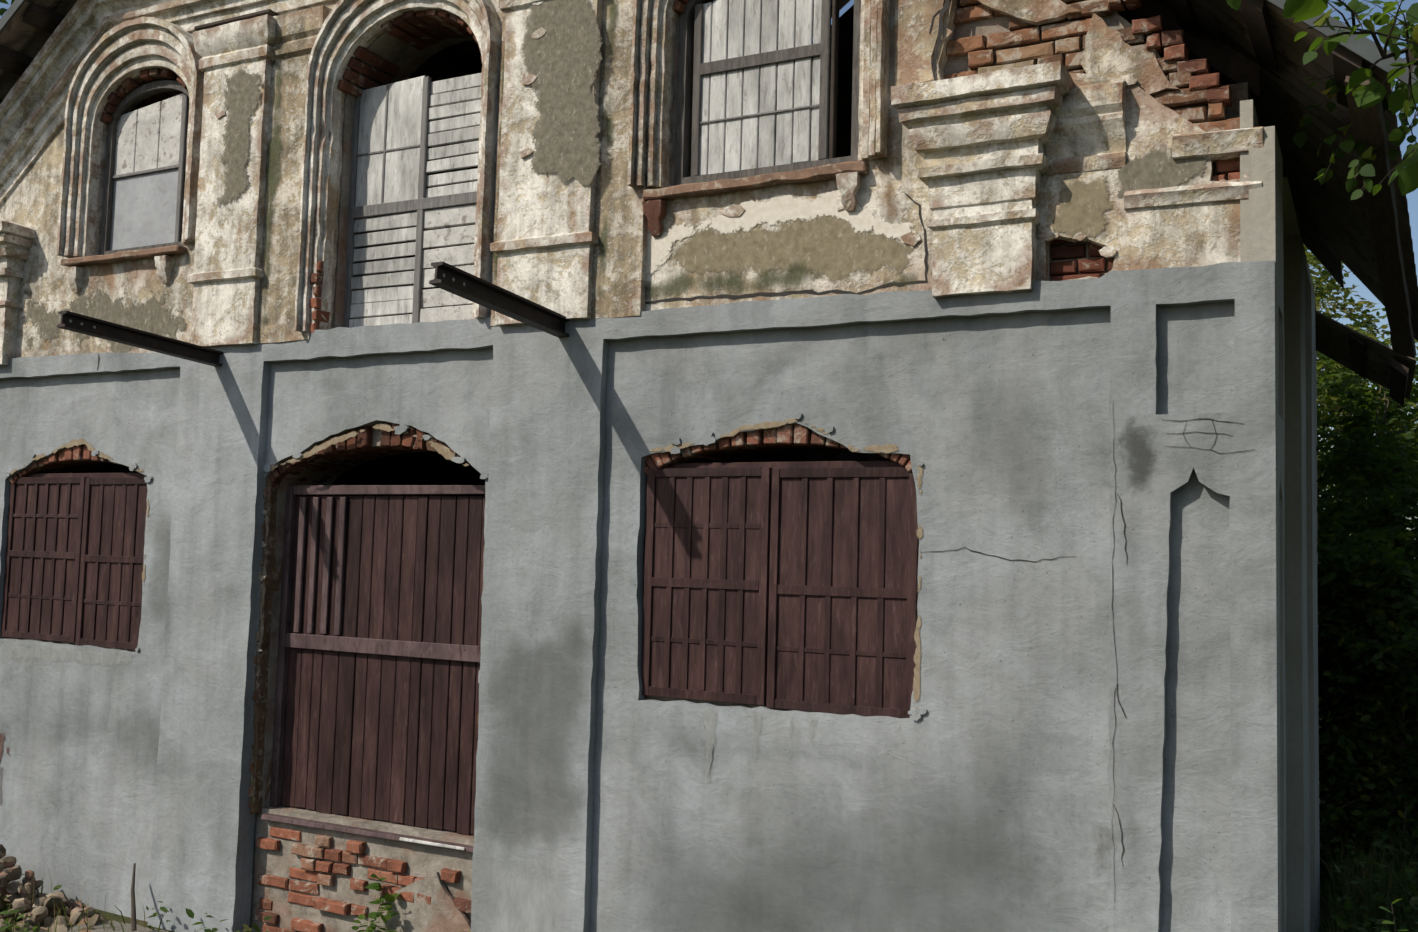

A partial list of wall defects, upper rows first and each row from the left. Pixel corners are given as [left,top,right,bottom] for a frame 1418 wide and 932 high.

peeling [519,0,603,186]
flaking render [941,0,1240,132]
peeling [646,189,921,283]
peeling [1038,148,1249,281]
flaking render [263,423,489,479]
flaking render [648,412,834,454]
flaking render [848,444,898,453]
water stain [1127,431,1151,480]
crack [1166,418,1255,454]
crack [921,547,1076,562]
flaking render [908,615,927,721]
crack [1112,418,1128,902]